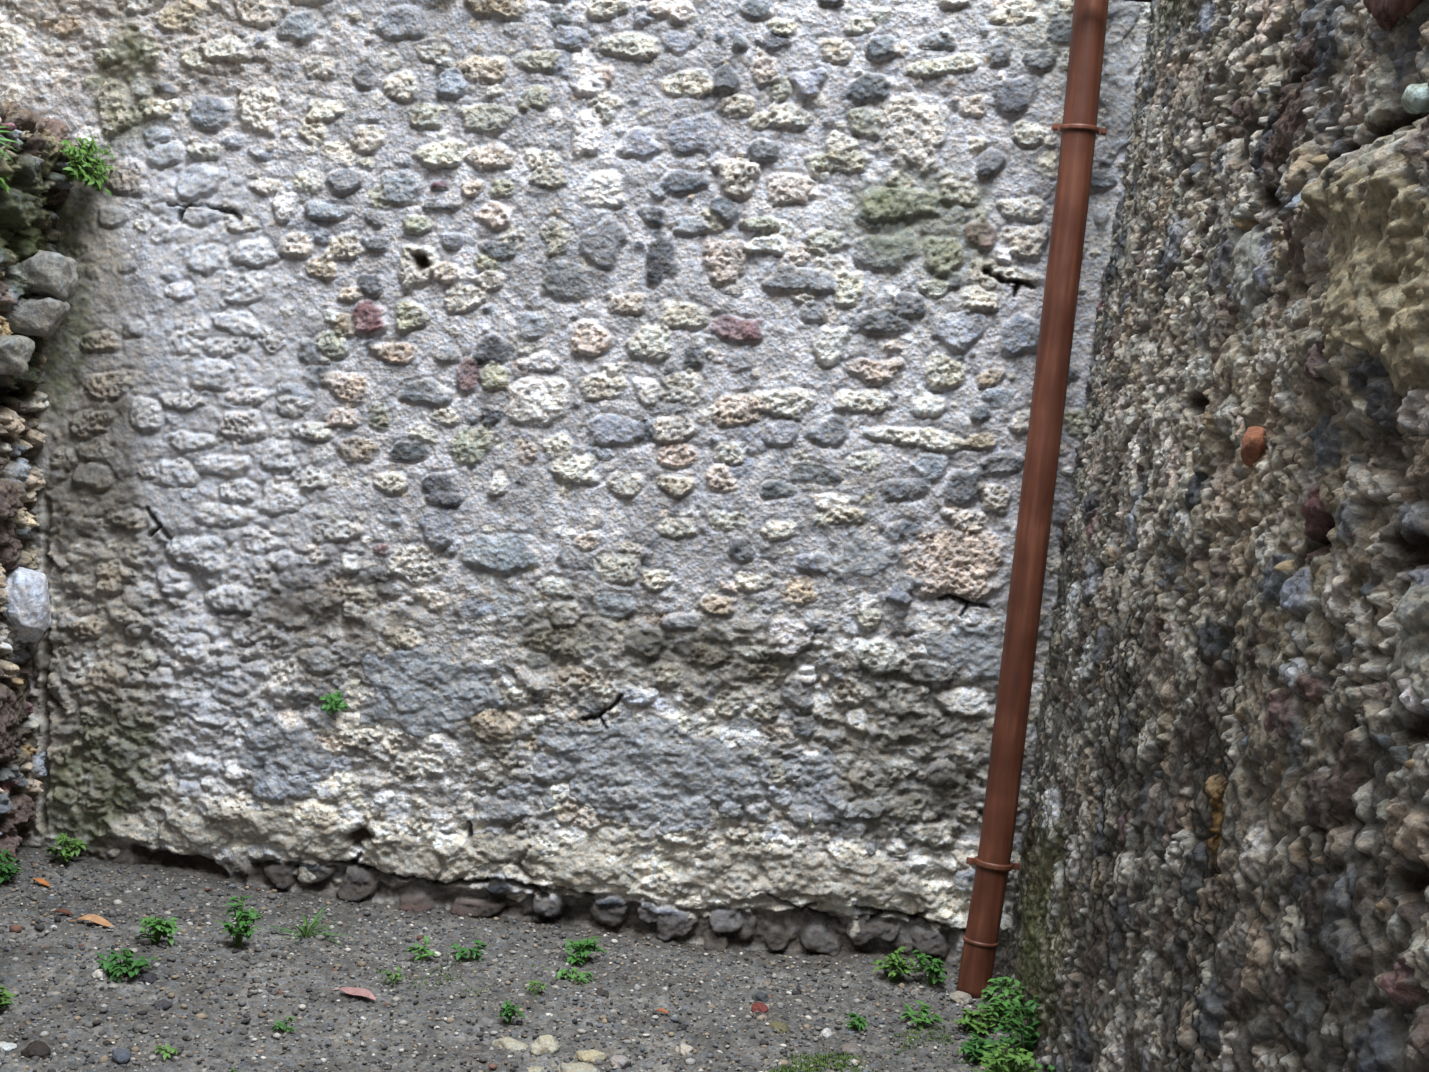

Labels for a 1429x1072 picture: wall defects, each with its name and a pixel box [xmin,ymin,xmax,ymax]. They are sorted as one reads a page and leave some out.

crack [170,204,242,223]
crack [983,270,1033,297]
crack [938,594,988,614]
crack [584,694,623,728]